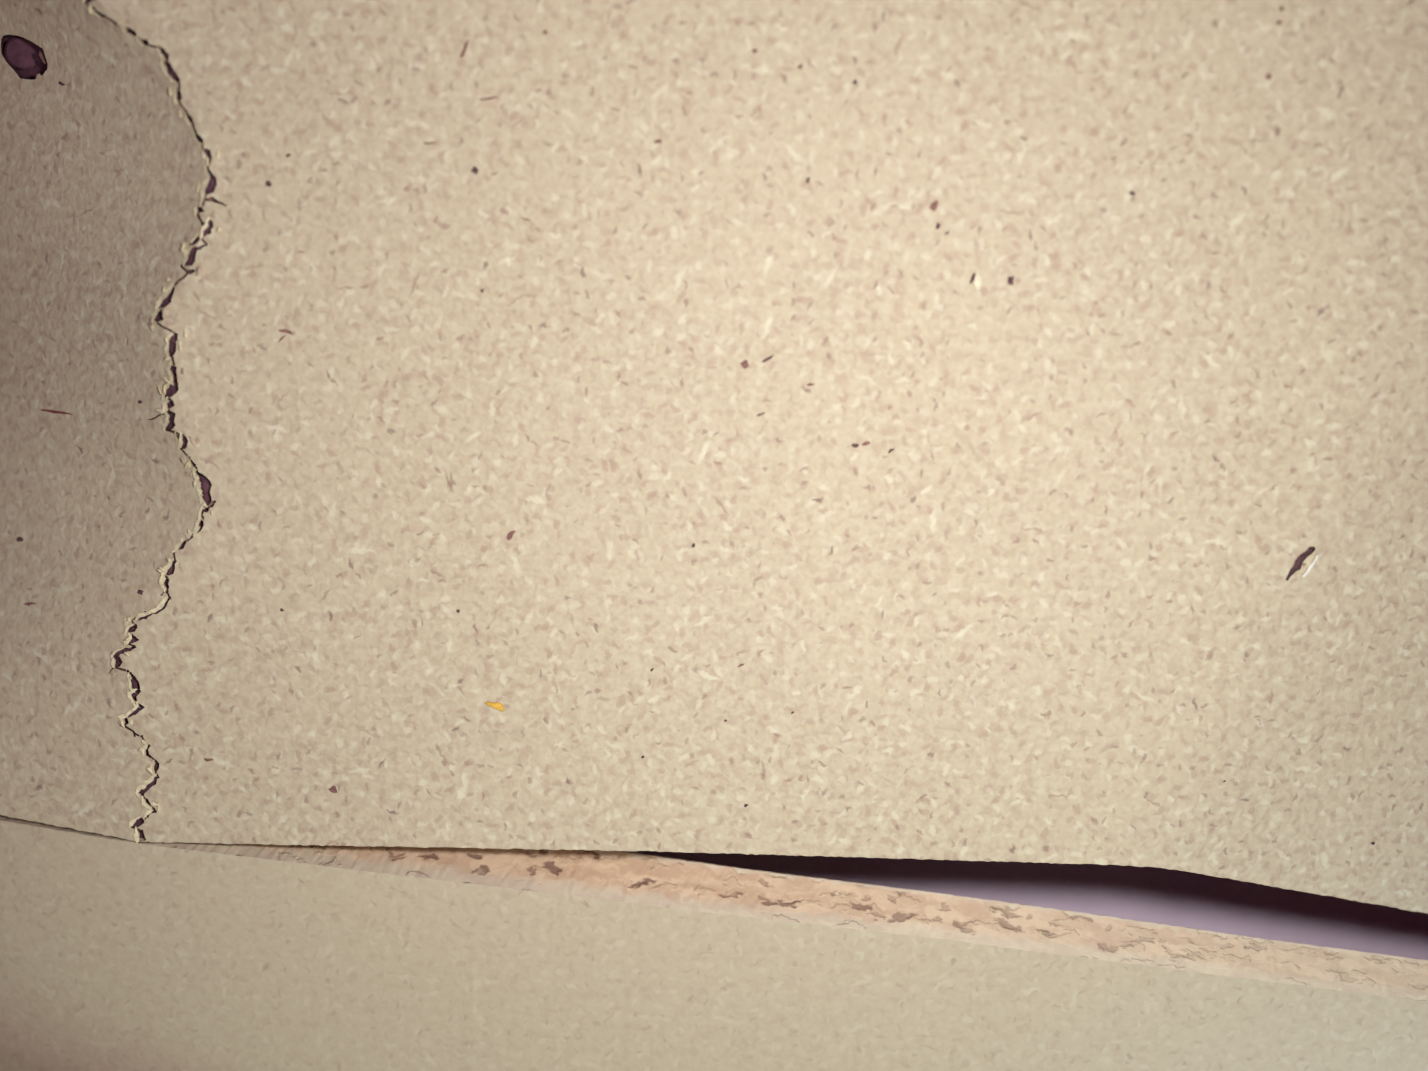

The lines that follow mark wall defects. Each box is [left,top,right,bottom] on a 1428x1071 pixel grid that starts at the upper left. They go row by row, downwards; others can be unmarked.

crack [82,0,227,844]